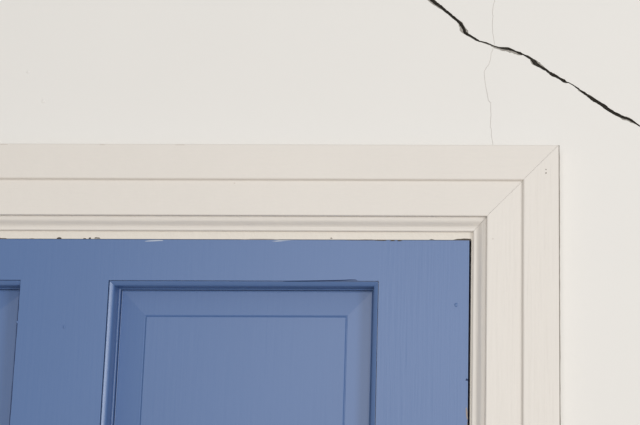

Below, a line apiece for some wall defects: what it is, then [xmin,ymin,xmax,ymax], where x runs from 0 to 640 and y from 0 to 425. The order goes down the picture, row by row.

crack [428,0,640,145]